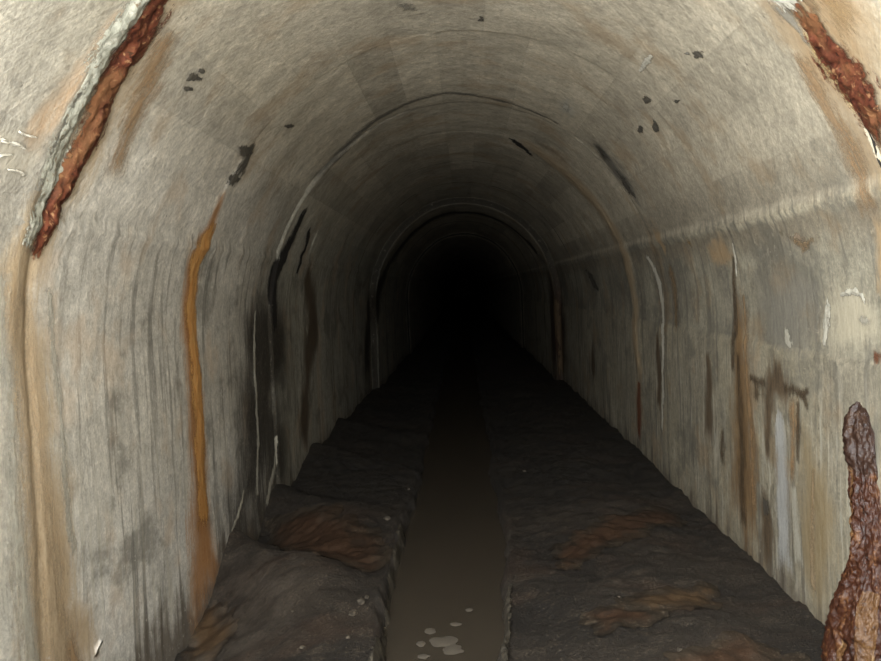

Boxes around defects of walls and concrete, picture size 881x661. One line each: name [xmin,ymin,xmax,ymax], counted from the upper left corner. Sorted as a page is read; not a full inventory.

rust [0,0,197,661]
rust [177,187,230,644]
damp [747,255,838,581]
rust [737,0,881,303]